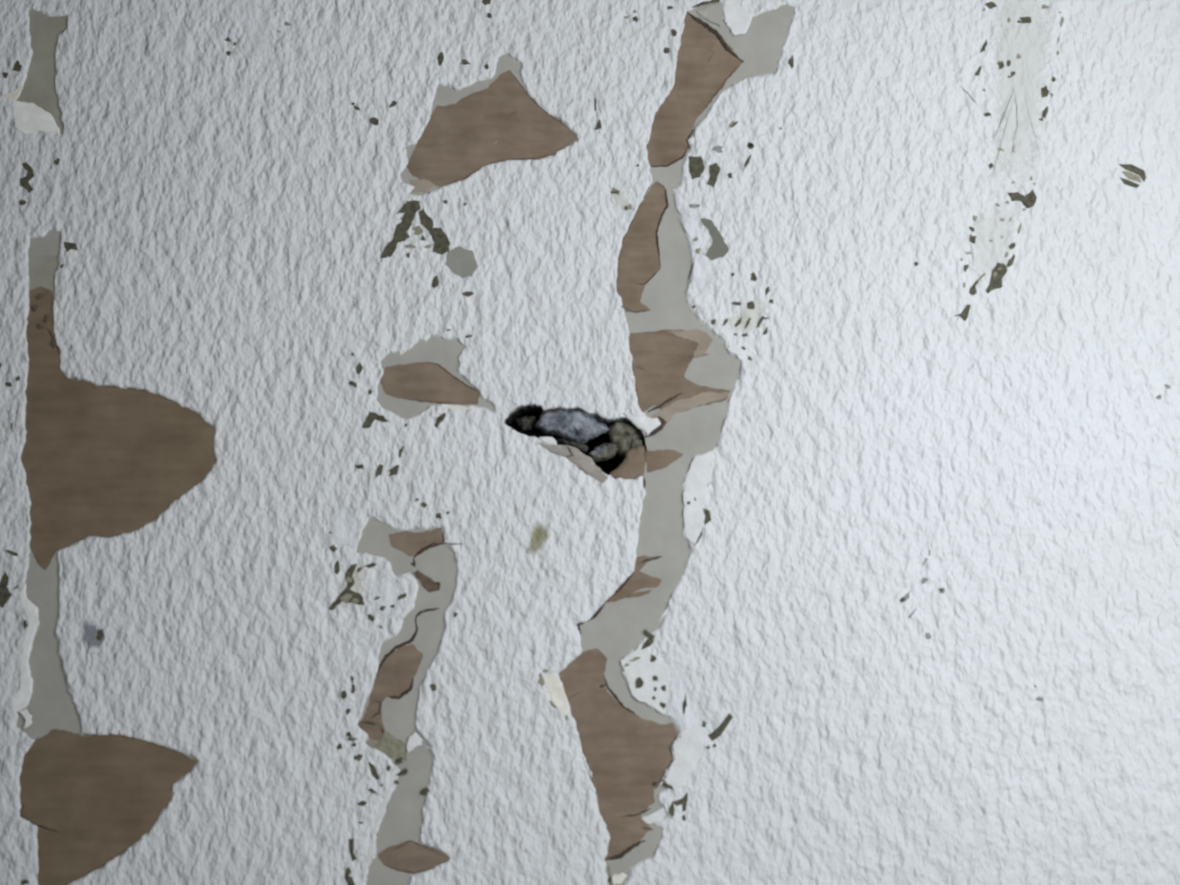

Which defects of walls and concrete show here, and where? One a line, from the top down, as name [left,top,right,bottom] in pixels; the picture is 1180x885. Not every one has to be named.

peeling [19,162,34,205]
peeling [2,10,67,135]
peeling [380,54,577,297]
peeling [0,229,217,885]
peeling [355,446,404,477]
peeling [349,329,495,428]
peeling [507,0,794,885]
peeling [329,498,462,885]